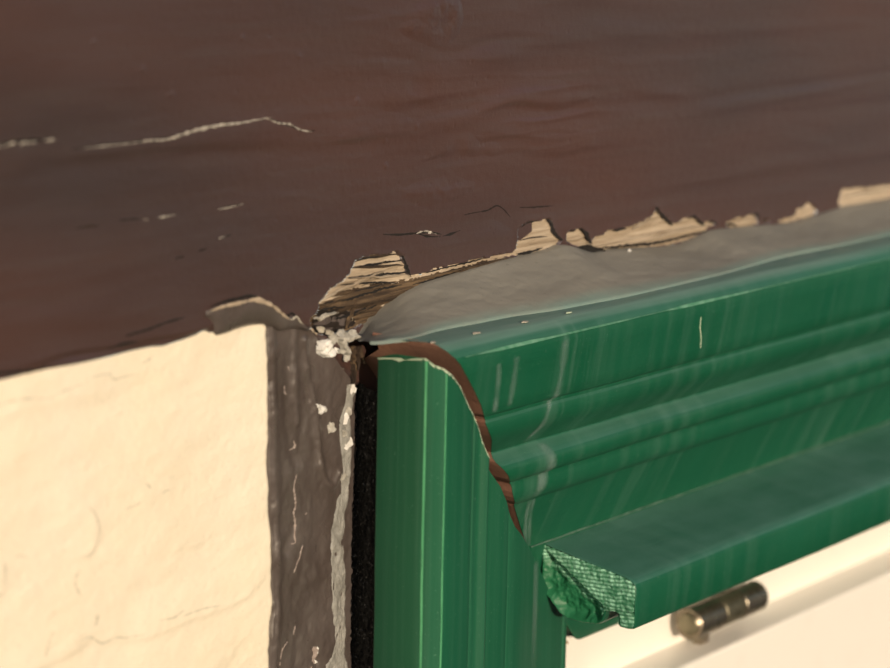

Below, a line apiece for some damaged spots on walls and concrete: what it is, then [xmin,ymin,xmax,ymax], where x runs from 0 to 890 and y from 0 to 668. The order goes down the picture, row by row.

crack [0,117,315,150]
peeling [838,185,890,206]
peeling [778,203,816,223]
peeling [205,206,767,369]